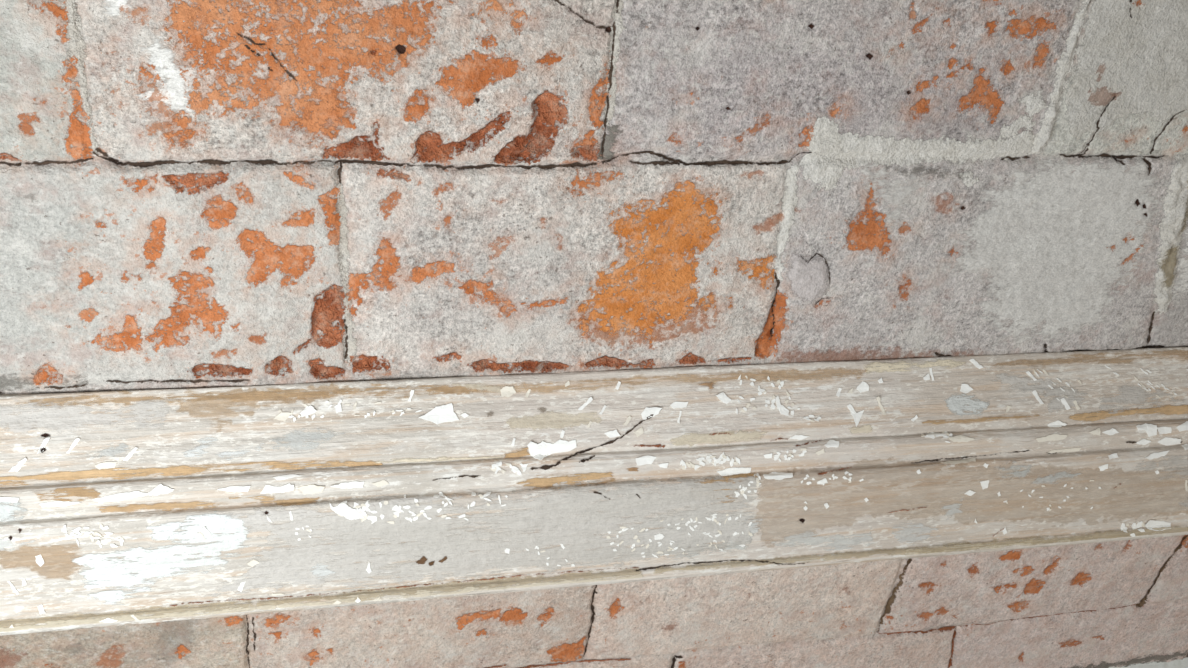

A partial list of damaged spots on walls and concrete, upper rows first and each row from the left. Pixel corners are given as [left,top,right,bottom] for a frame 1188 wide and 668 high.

peeling [138,0,453,220]
crack [0,0,812,184]
peeling [404,35,568,166]
crack [1059,96,1185,175]
peeling [123,171,341,292]
peeling [29,217,477,424]
crack [342,320,350,359]
spalling [433,352,656,397]
peeling [458,180,733,344]
peeling [0,437,508,548]
peeling [594,435,864,558]
crack [877,535,1188,667]